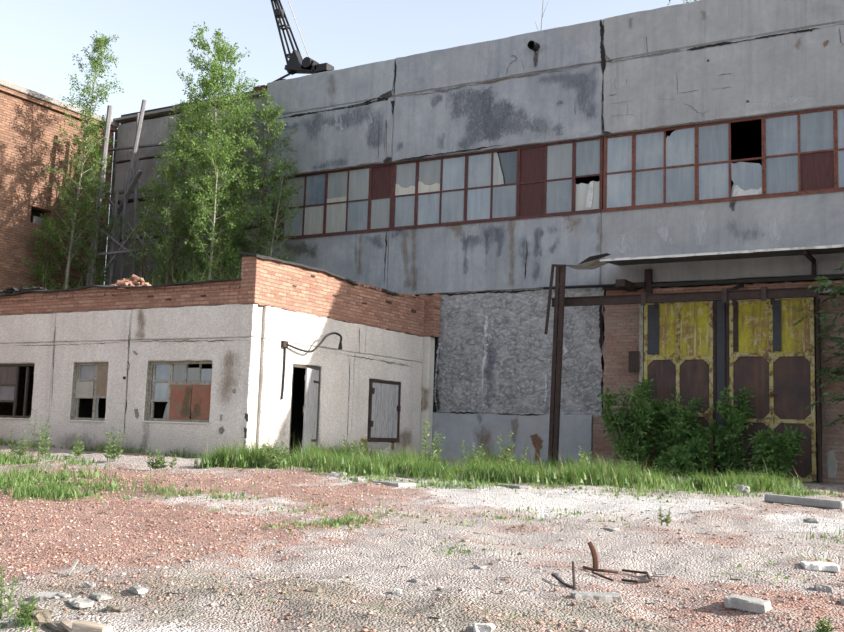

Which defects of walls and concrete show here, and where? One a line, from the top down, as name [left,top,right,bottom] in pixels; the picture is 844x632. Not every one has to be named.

crack [278,21,844,158]
leakage [307,107,382,148]
leakage [462,226,503,256]
leakage [522,230,543,278]
rust [530,434,543,462]